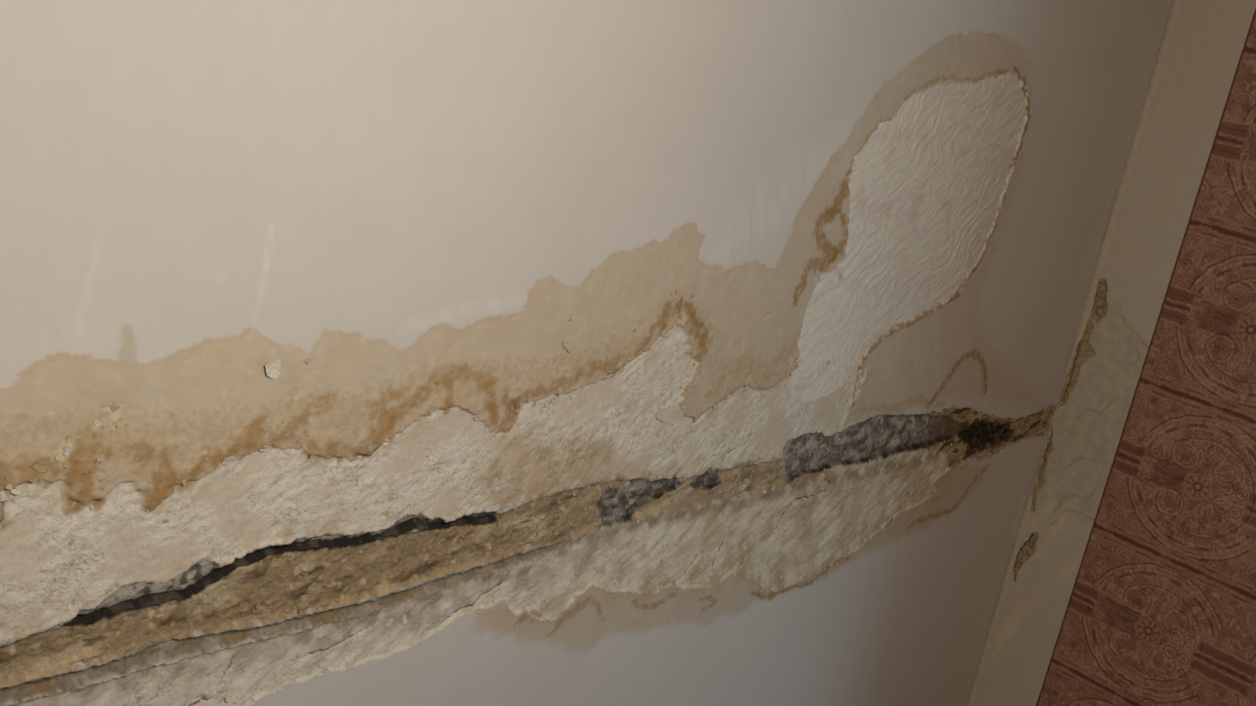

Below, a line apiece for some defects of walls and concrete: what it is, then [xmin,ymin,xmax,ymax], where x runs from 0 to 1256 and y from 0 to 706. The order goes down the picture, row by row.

crack [0,509,499,649]
crack [354,441,385,457]
crack [446,578,509,619]
peeling [0,64,1031,706]
leakage [0,28,1050,658]
crack [776,479,831,528]
peeling [1012,531,1040,583]
spalling [1055,277,1110,410]
leakage [1021,289,1157,543]